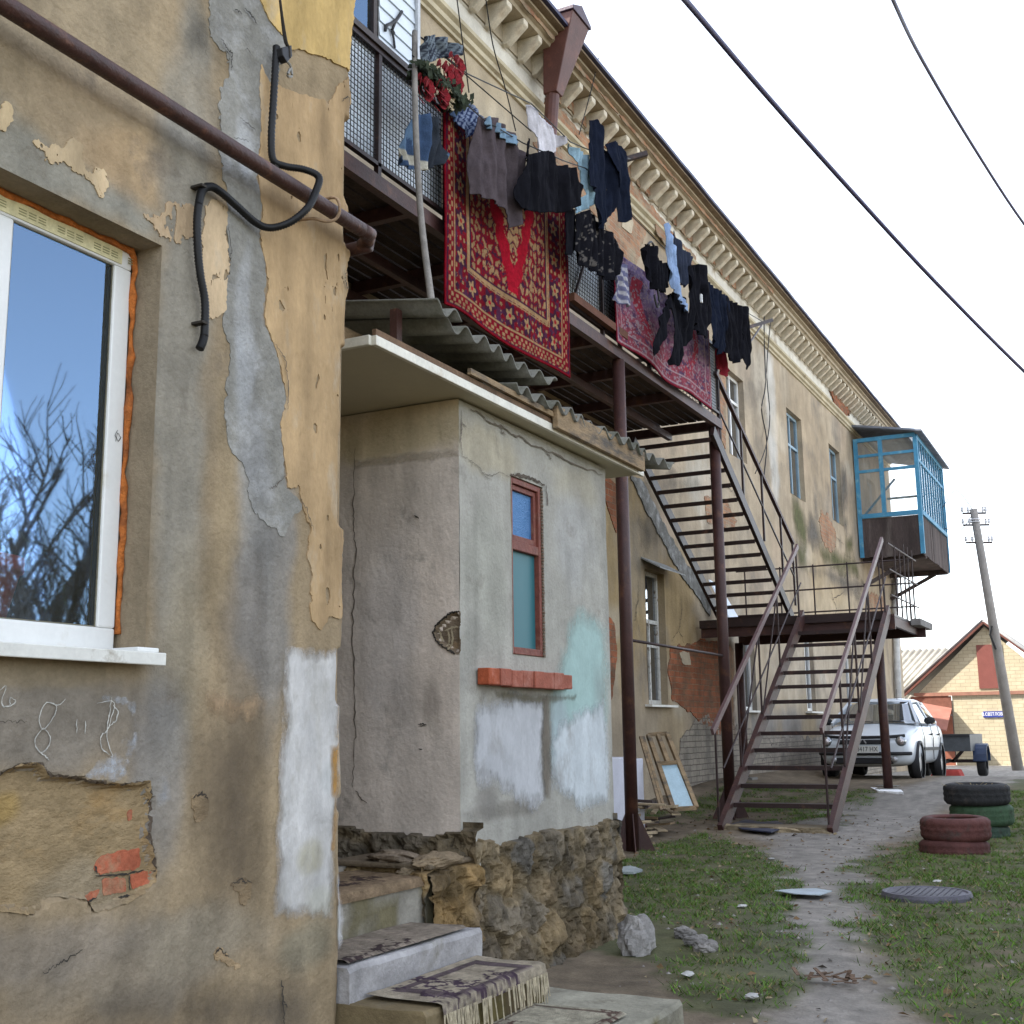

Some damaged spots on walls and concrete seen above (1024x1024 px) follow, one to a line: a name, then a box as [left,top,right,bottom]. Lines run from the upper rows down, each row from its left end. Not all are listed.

peeling [0,101,14,132]
peeling [32,137,109,198]
flaking render [259,0,355,212]
flaking render [143,199,230,319]
flaking render [257,174,350,630]
crack [351,451,367,803]
spalling [0,762,157,915]
flaking render [667,638,823,786]
flaking render [866,767,896,775]